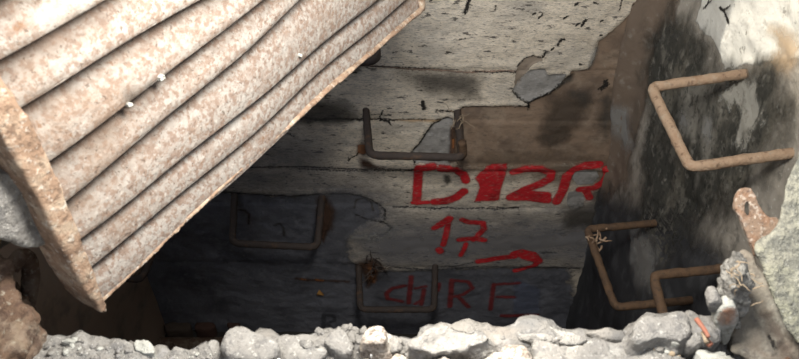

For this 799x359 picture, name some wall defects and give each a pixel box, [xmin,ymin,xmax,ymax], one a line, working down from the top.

flaking render [696,0,799,70]
flaking render [411,0,679,210]
rust [357,144,376,168]